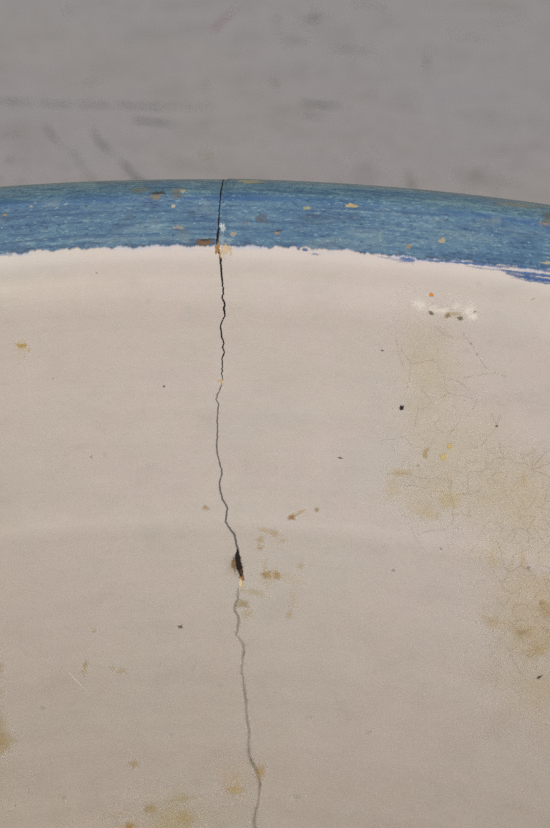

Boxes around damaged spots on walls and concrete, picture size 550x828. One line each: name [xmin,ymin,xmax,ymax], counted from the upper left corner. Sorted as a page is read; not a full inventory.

crack [216,179,243,577]